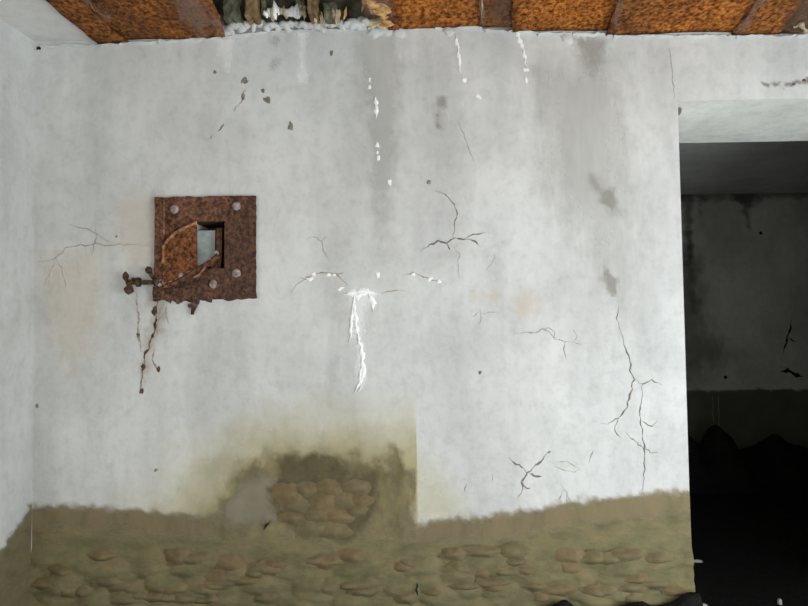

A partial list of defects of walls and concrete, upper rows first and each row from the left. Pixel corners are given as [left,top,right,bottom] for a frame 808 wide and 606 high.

peeling [314,6,347,28]
peeling [362,0,394,27]
peeling [792,12,808,34]
crack [43,225,150,288]
crack [292,237,349,292]
crack [375,192,495,293]
leakage [681,192,808,371]
corrosion [136,294,169,394]
efflorescence [343,288,381,392]
crack [603,309,660,490]
leakage [0,438,695,606]
crack [510,451,594,503]